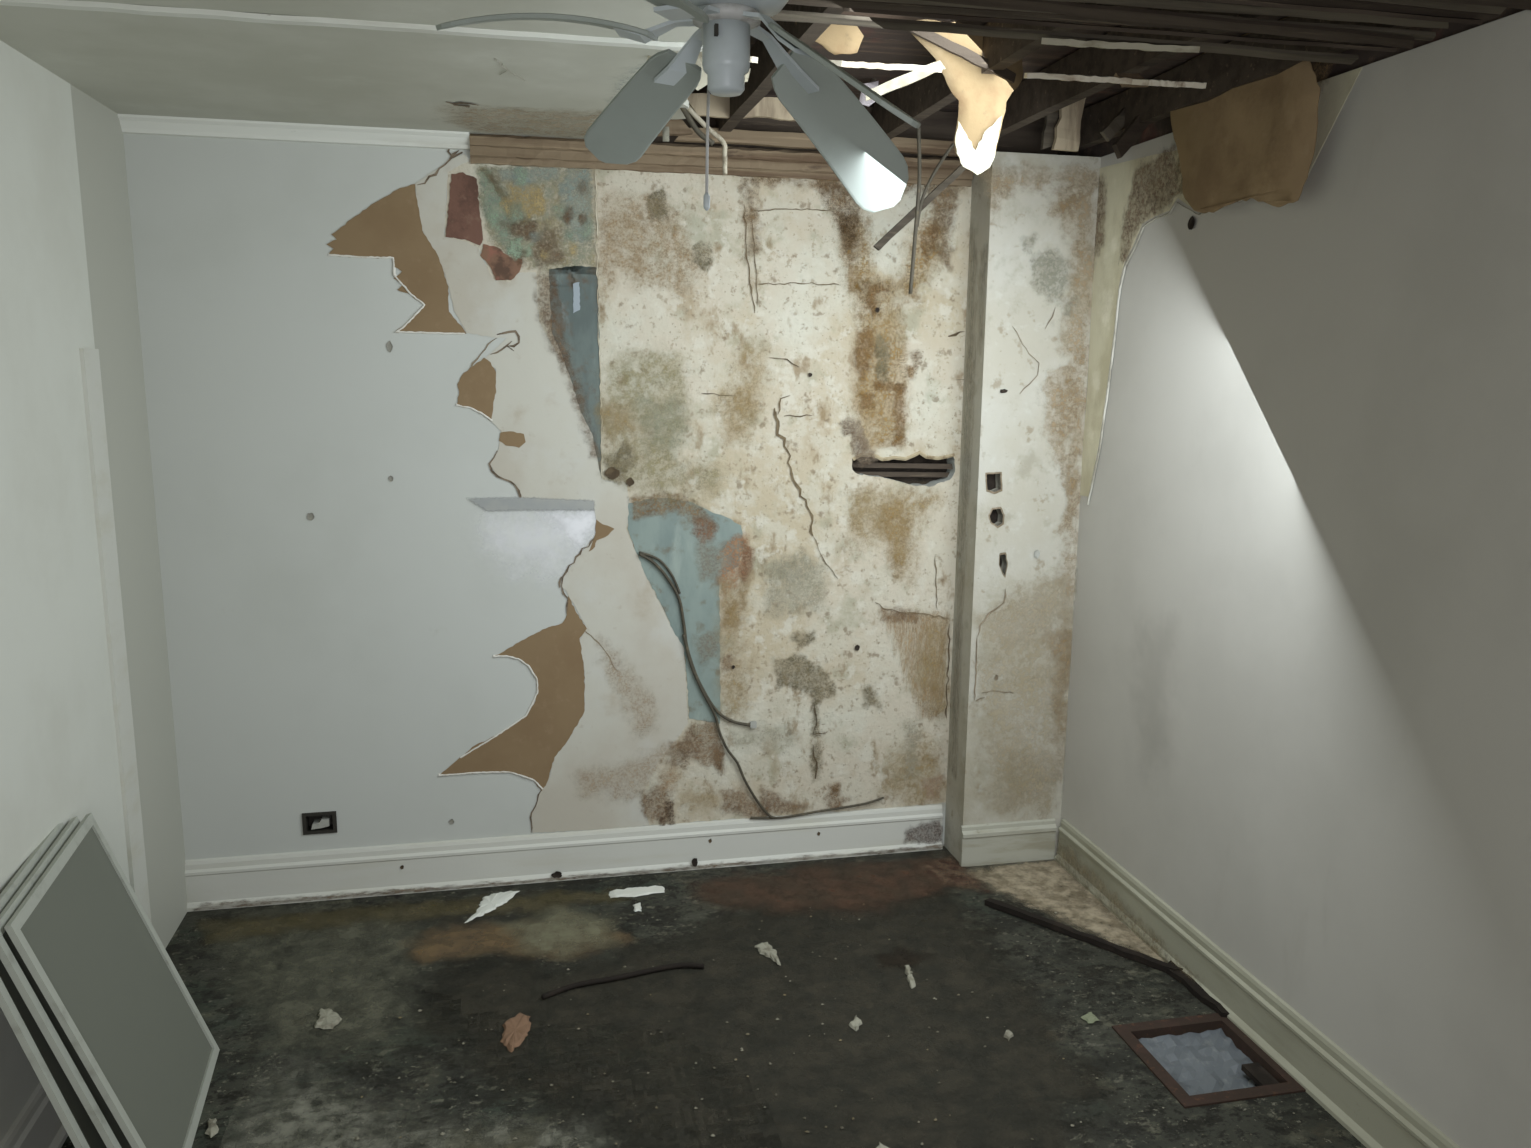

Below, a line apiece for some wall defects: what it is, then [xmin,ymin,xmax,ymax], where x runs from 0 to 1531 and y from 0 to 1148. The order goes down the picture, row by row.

flaking render [1308,62,1362,175]
damp [602,190,712,293]
crack [743,205,839,313]
damp [811,179,859,250]
damp [993,171,1094,519]
flaking render [1080,150,1204,505]
flaking render [327,154,972,833]
crack [769,357,836,576]
spalling [985,472,1005,528]
damp [776,632,835,772]
crack [875,554,1012,718]
damp [642,723,724,826]